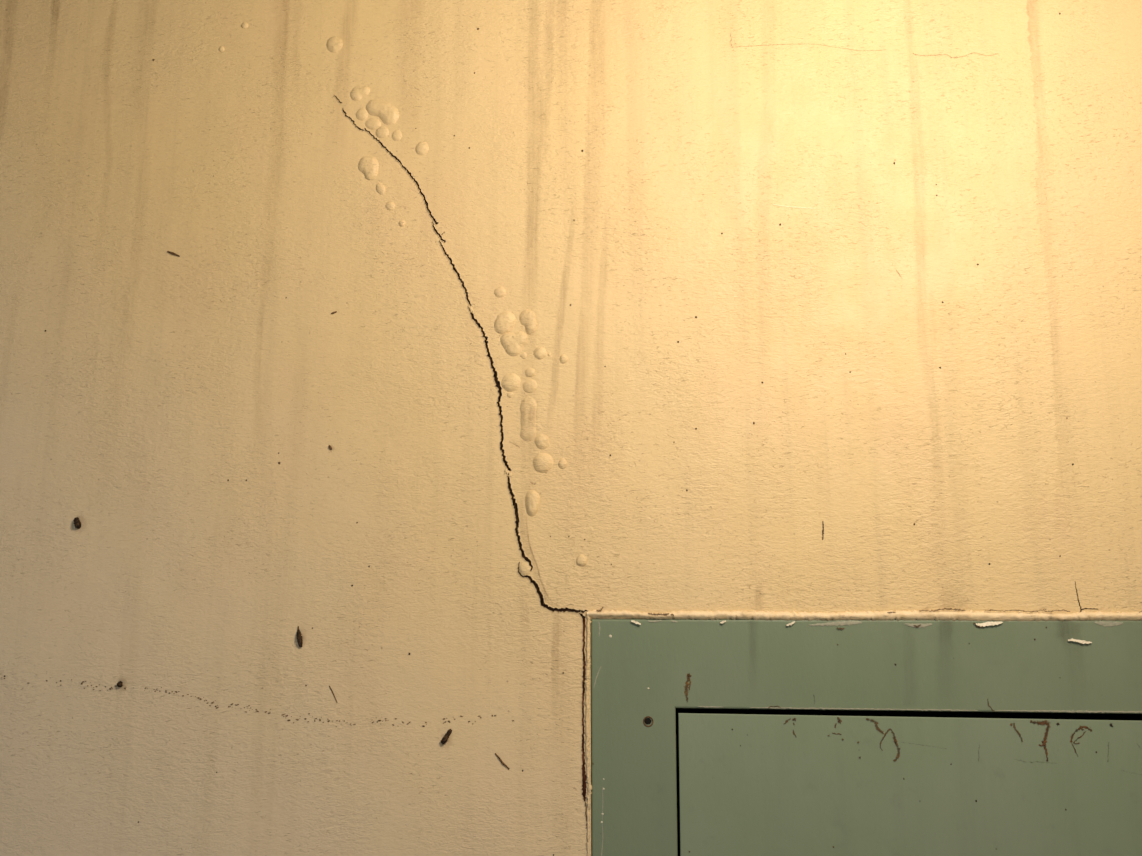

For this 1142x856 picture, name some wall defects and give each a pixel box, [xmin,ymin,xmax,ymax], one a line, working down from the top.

crack [334,95,588,828]